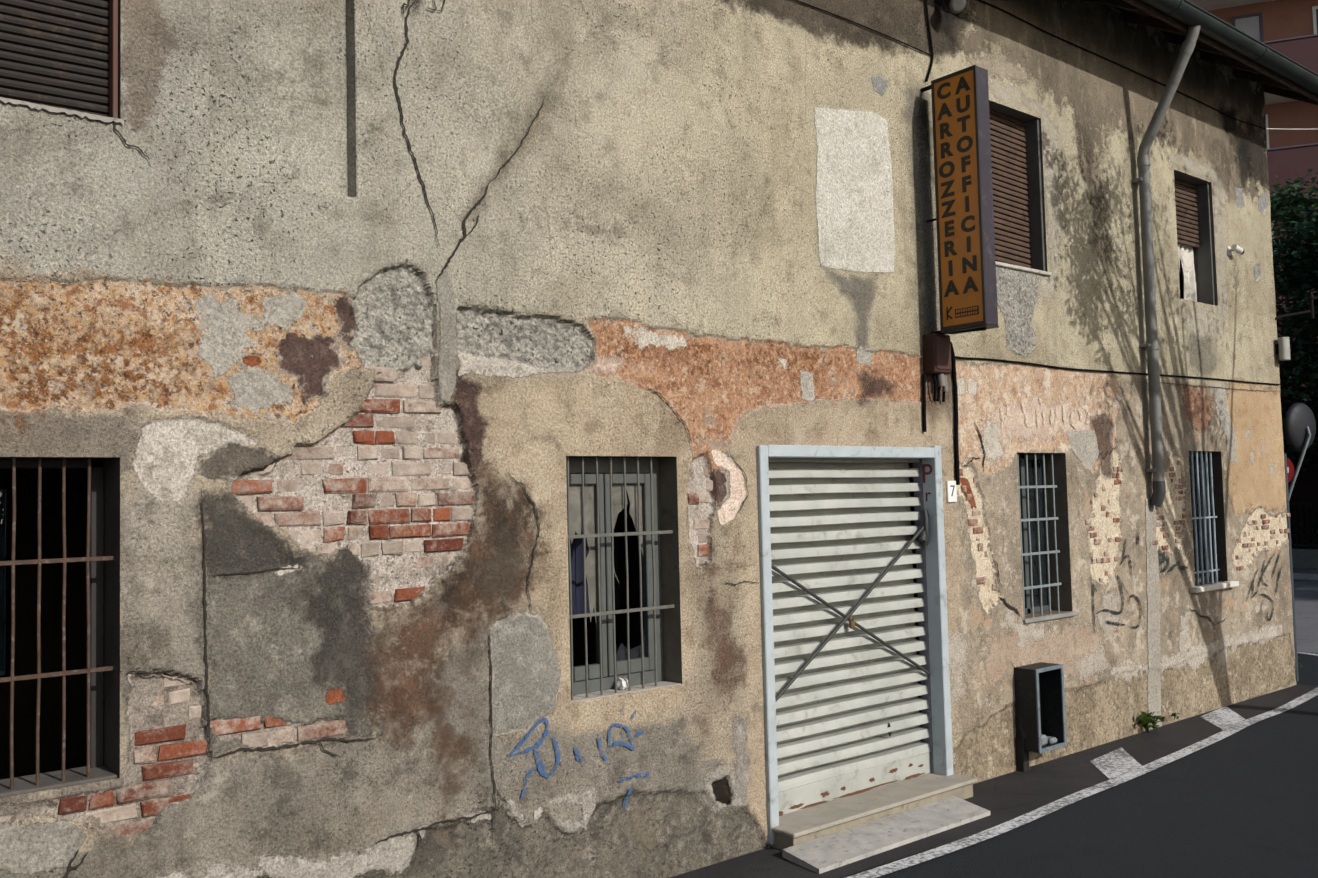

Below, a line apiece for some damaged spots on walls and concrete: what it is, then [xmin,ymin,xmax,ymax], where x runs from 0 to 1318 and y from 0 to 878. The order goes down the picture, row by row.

crack [394,0,546,280]
damp [724,0,1270,271]
peeling [0,265,480,609]
peeling [456,307,934,574]
peeling [950,78,1291,690]
flaking render [0,669,347,837]
flaking render [156,825,429,878]
flaking render [459,788,596,833]
flaking render [707,598,745,688]
flaking render [705,718,749,811]